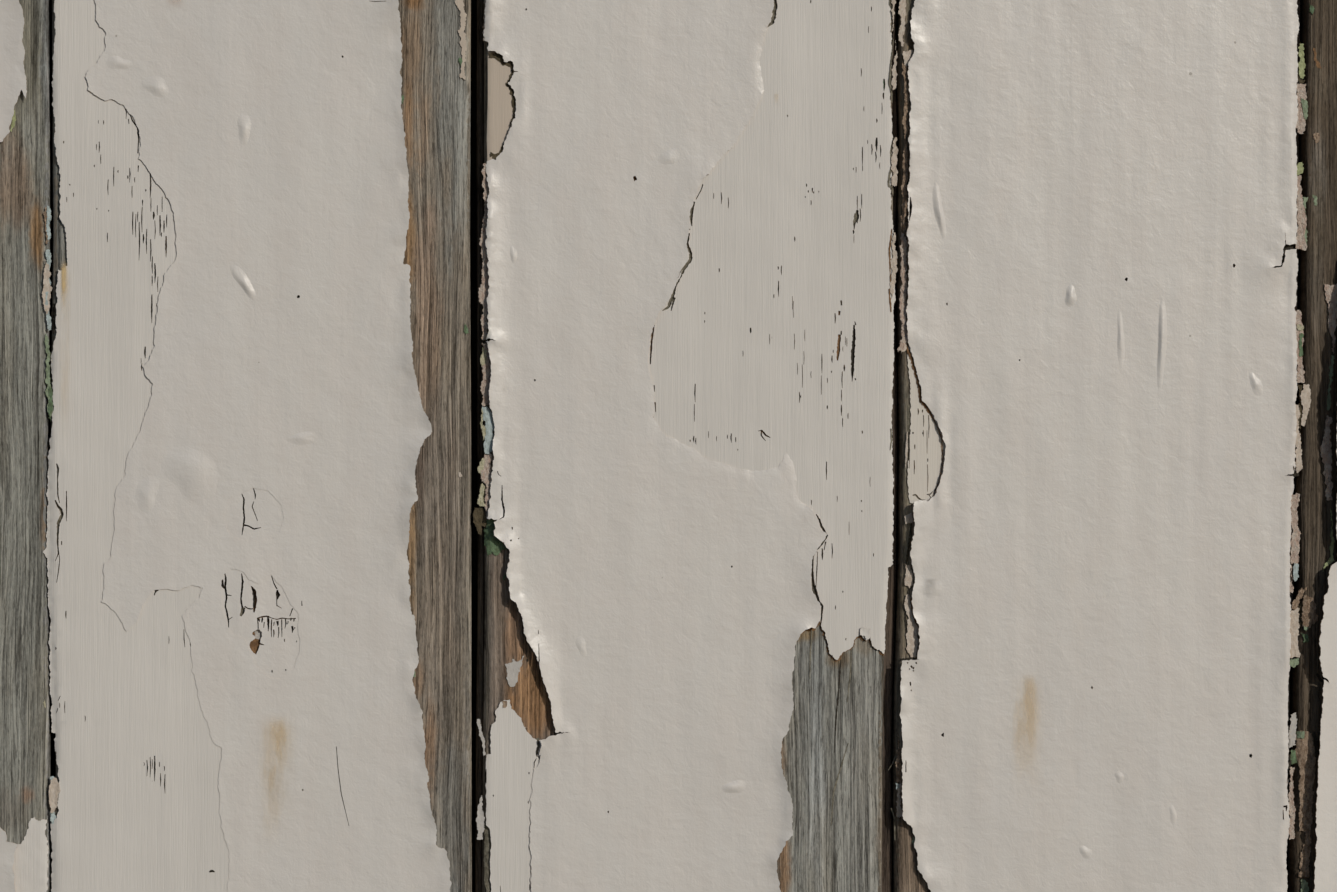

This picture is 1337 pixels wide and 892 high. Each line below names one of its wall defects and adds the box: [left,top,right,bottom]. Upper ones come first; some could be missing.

crack [650,184,703,418]
peeling [0,0,229,892]
crack [242,488,261,534]
peeling [223,488,284,541]
peeling [221,569,300,679]
crack [221,574,302,627]
peeling [398,0,555,892]
peeling [648,0,946,892]
peeling [1288,0,1337,892]